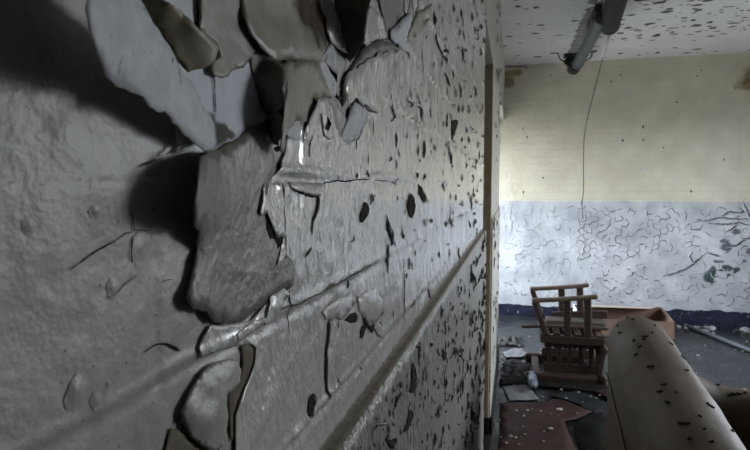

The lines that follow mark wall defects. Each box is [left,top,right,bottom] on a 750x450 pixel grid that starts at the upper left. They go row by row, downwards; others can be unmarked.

crack [70,213,147,297]
crack [280,183,288,233]
peeling [85,0,500,450]
crack [322,178,399,194]
crack [501,201,750,307]
crack [142,343,180,354]